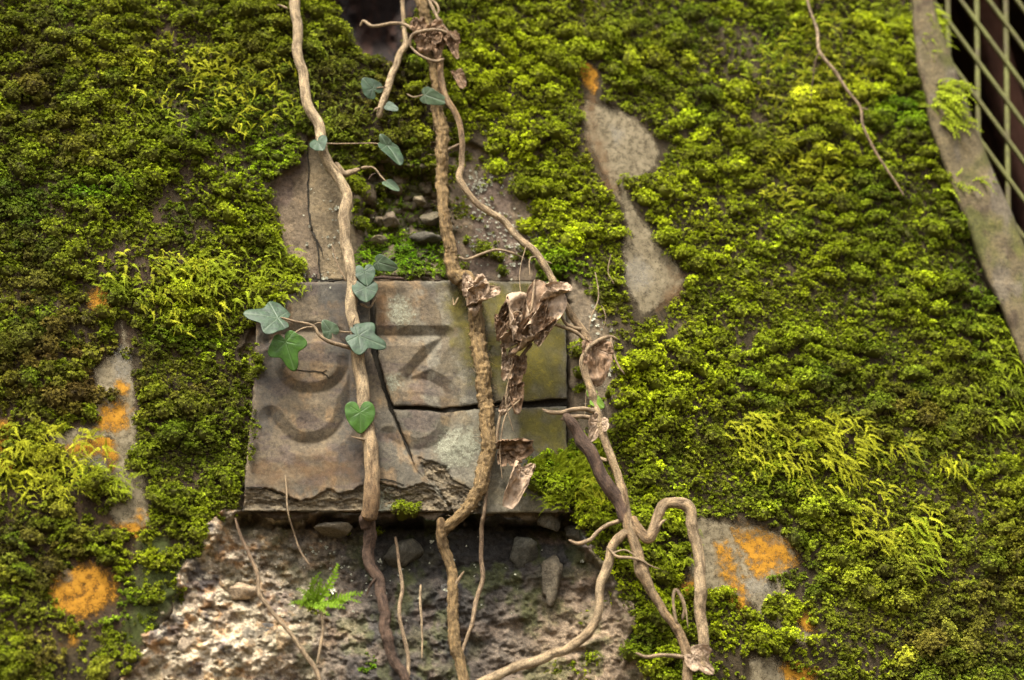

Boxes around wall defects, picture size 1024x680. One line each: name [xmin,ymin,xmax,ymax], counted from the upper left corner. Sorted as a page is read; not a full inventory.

crack [297,142,347,282]
crack [370,299,567,461]
spalling [119,459,645,680]